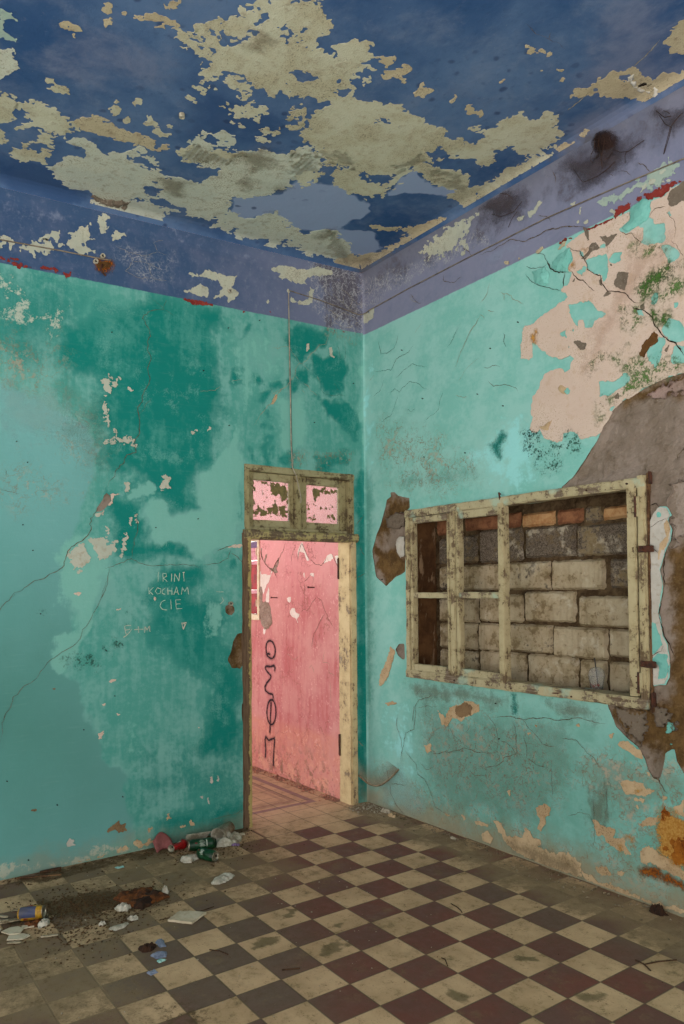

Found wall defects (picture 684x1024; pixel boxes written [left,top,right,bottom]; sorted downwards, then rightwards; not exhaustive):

peeling [0,0,590,305]
peeling [556,66,684,102]
crack [111,240,170,480]
crack [443,215,684,391]
crack [0,506,99,609]
crack [1,522,337,737]
spalling [373,492,410,586]
leakage [522,430,581,471]
peeling [520,157,684,827]
crack [387,695,607,845]
peeling [445,803,684,914]
corrosion [639,806,684,891]